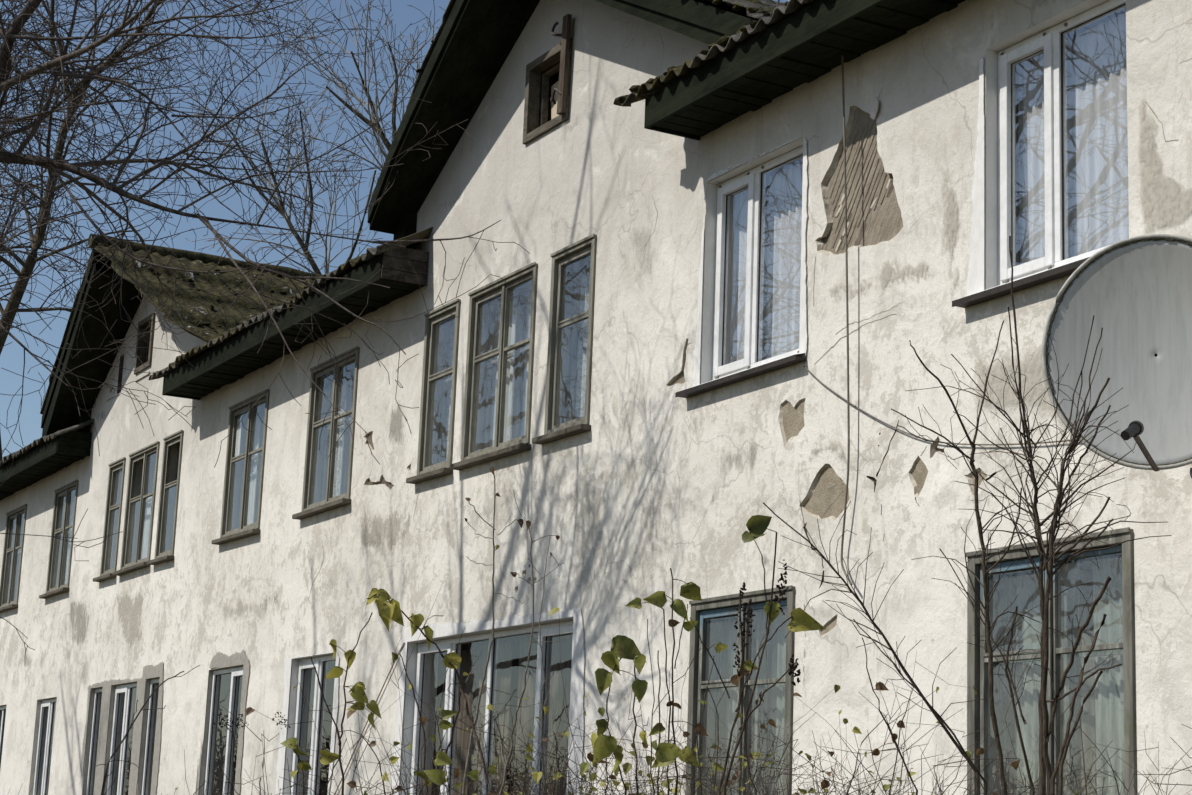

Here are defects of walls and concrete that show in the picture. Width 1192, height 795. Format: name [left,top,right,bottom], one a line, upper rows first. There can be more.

flaking render [816,88,903,256]
flaking render [778,398,806,446]
flaking render [799,464,849,521]
flaking render [908,437,944,505]
flaking render [964,467,1005,496]